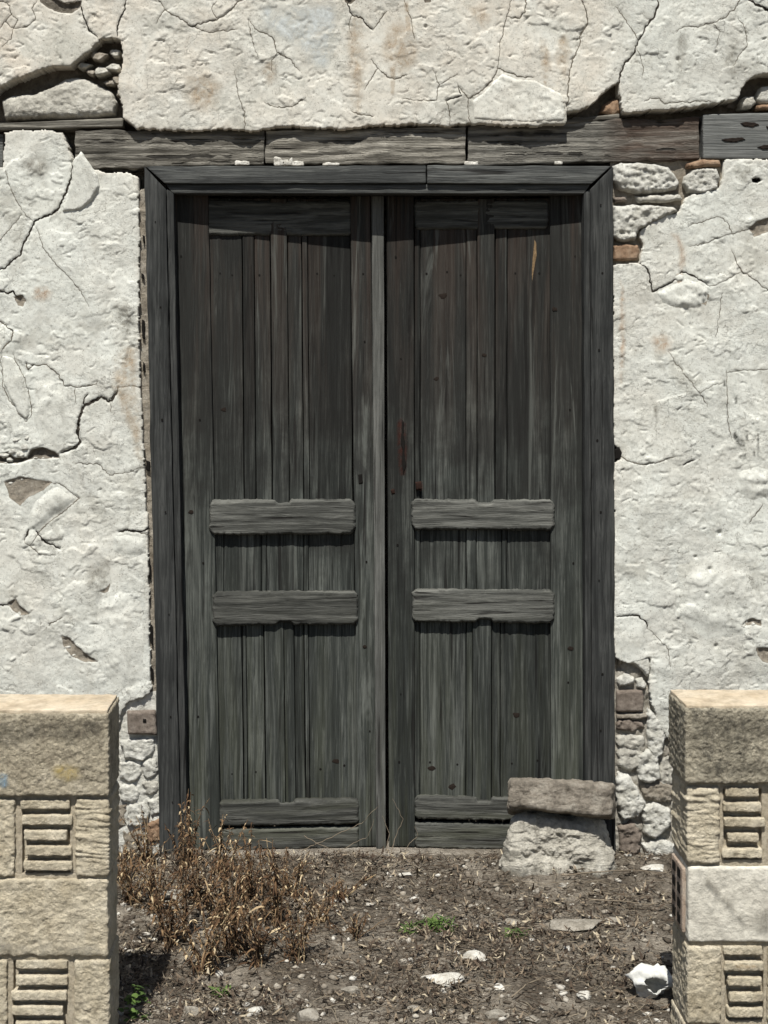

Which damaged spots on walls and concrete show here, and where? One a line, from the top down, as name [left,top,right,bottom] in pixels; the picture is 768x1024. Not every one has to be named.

spalling [0,42,130,135]
crack [157,0,300,72]
crack [347,0,534,126]
crack [616,0,716,104]
spalling [727,78,768,113]
crack [0,161,89,306]
spalling [609,158,724,265]
crack [639,216,768,337]
spalling [0,436,60,463]
crack [0,321,145,475]
spalling [116,189,160,855]
spalling [614,658,681,924]